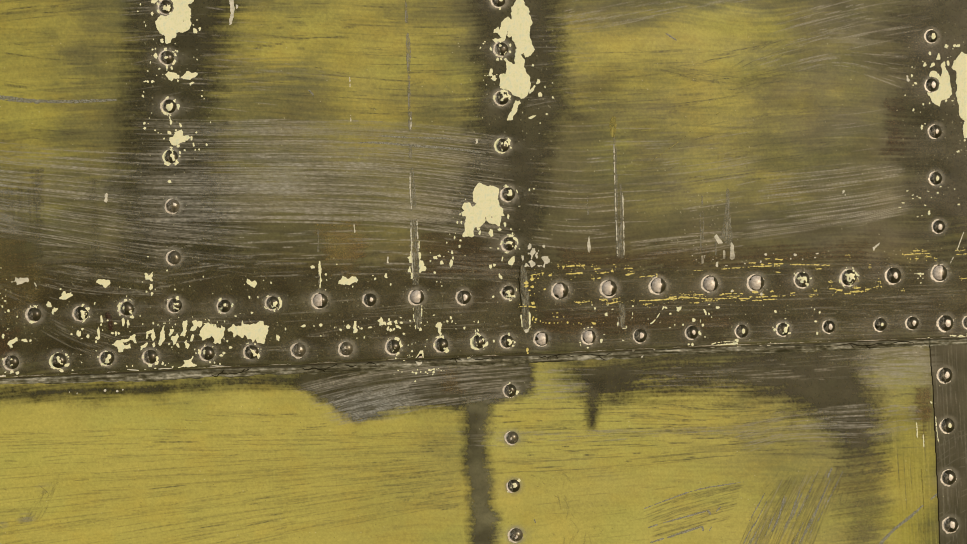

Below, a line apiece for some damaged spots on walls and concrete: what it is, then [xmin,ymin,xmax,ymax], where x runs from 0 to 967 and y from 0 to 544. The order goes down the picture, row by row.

peeling [137,0,205,99]
peeling [480,0,554,134]
peeling [904,44,967,153]
peeling [0,288,73,324]
peeling [71,288,286,371]
peeling [244,279,282,312]
peeling [407,183,795,348]
peeling [713,253,830,335]